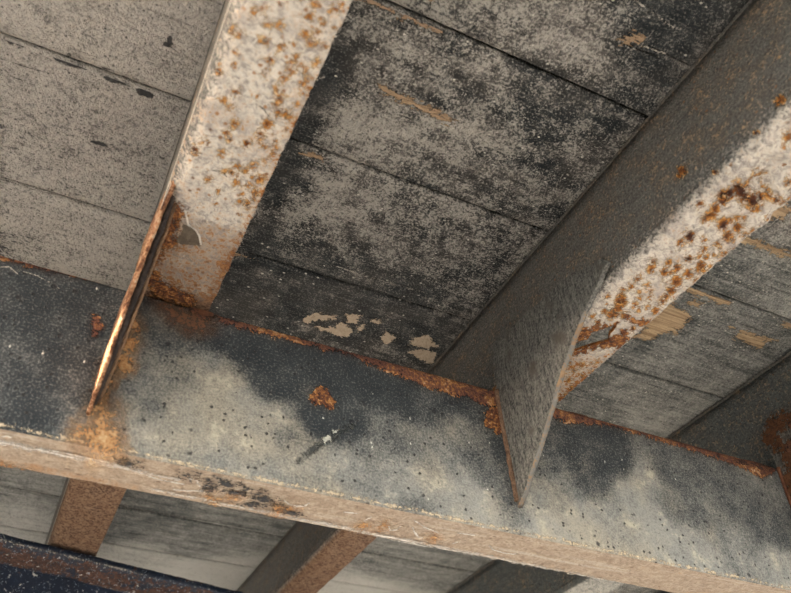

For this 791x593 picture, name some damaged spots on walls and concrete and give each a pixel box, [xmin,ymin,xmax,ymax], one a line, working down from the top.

rust [190,0,345,216]
rust [90,314,104,337]
rust [115,320,140,373]
rust [148,201,502,435]
peeling [303,312,397,344]
peeling [407,335,439,364]
rust [562,167,790,398]
peeling [632,287,732,341]
rust [70,380,122,465]
rust [553,408,791,497]